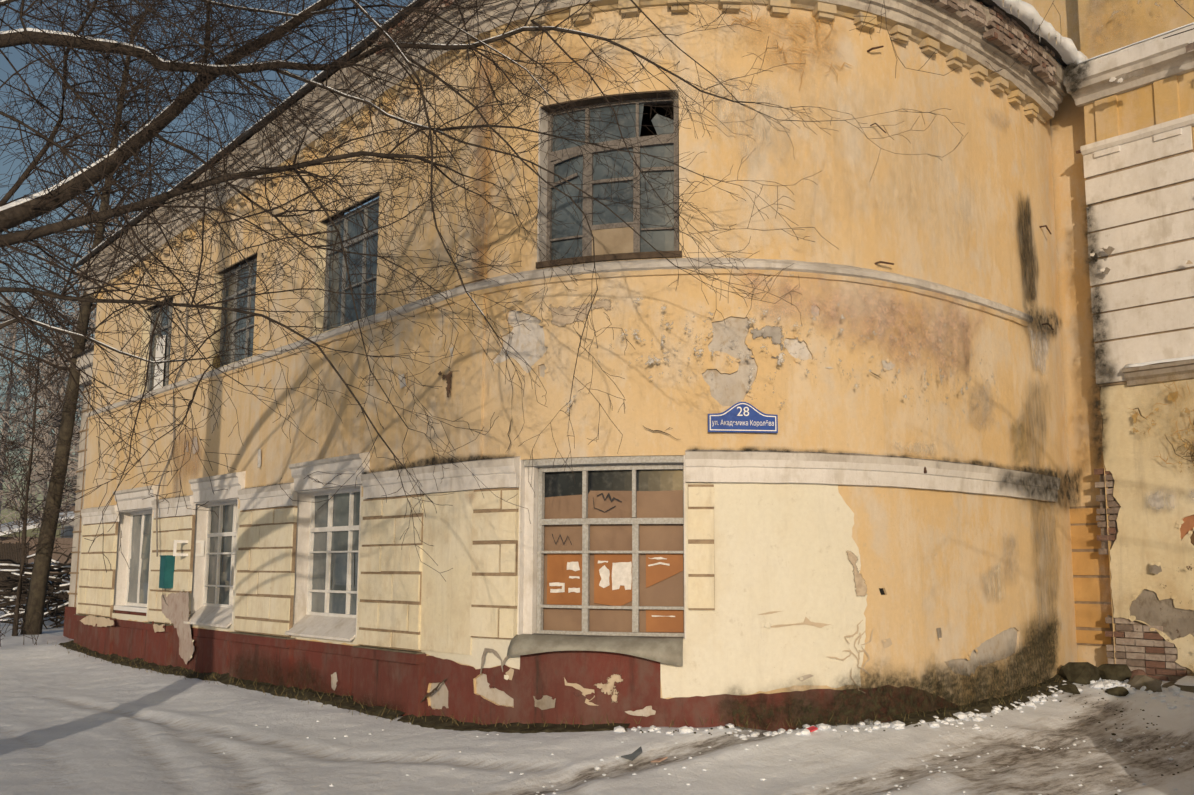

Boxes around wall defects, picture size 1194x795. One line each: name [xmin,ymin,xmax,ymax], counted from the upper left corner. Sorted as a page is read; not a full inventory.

water stain [1019,198,1061,366]
flaking render [493,298,611,377]
flaking render [611,297,998,420]
water stain [1084,205,1115,462]
flaking render [1094,468,1121,555]
flaking render [1175,515,1194,545]
flaking render [152,588,194,665]
flaking render [425,678,449,711]
flaking render [476,668,514,707]
peeling [564,674,659,717]